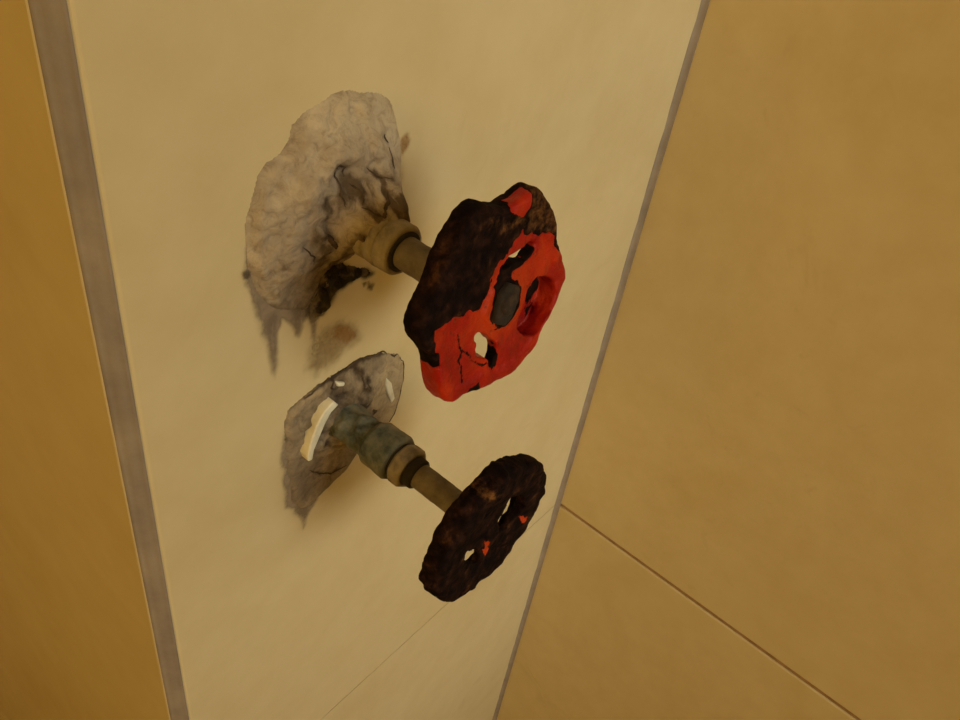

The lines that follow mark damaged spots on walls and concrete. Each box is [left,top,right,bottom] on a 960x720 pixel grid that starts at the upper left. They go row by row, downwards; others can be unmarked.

leakage [245,260,322,358]
leakage [282,436,316,518]